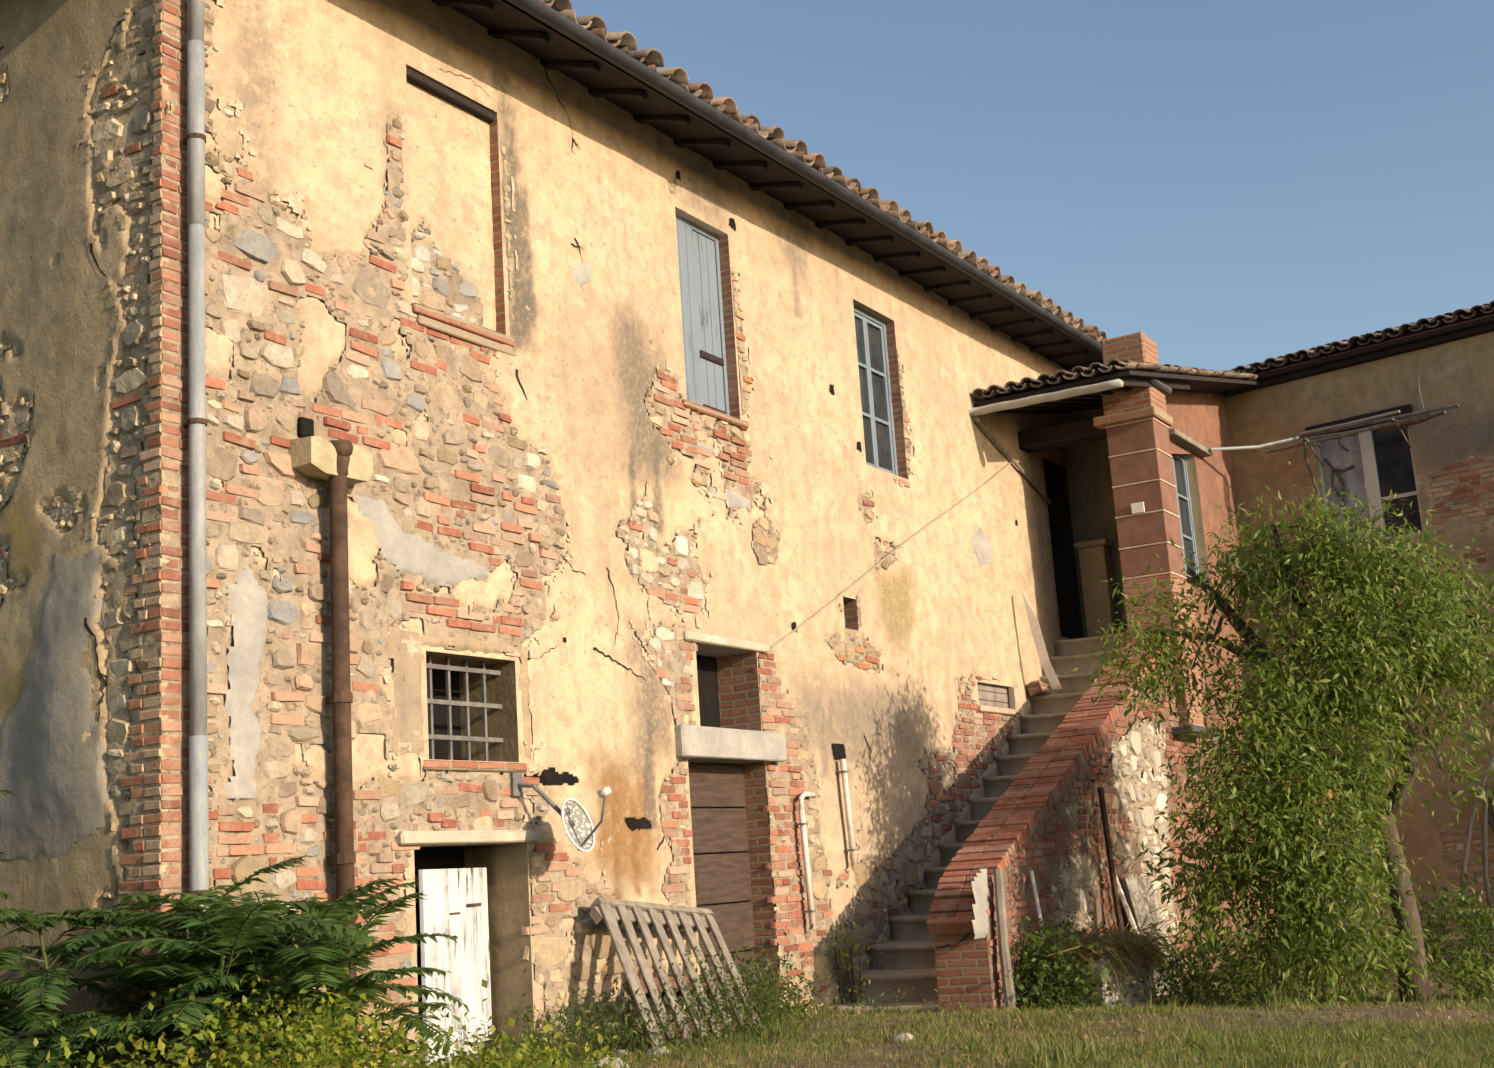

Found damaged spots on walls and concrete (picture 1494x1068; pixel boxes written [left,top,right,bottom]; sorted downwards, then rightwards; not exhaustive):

spalling [0,65,9,103]
crack [544,67,581,155]
spalling [0,543,28,604]
spalling [0,383,33,512]
crack [84,617,142,759]
spalling [43,0,666,1068]
spalling [617,267,782,726]
spalling [826,593,885,675]
spalling [1421,454,1494,573]
spalling [752,652,1050,1010]